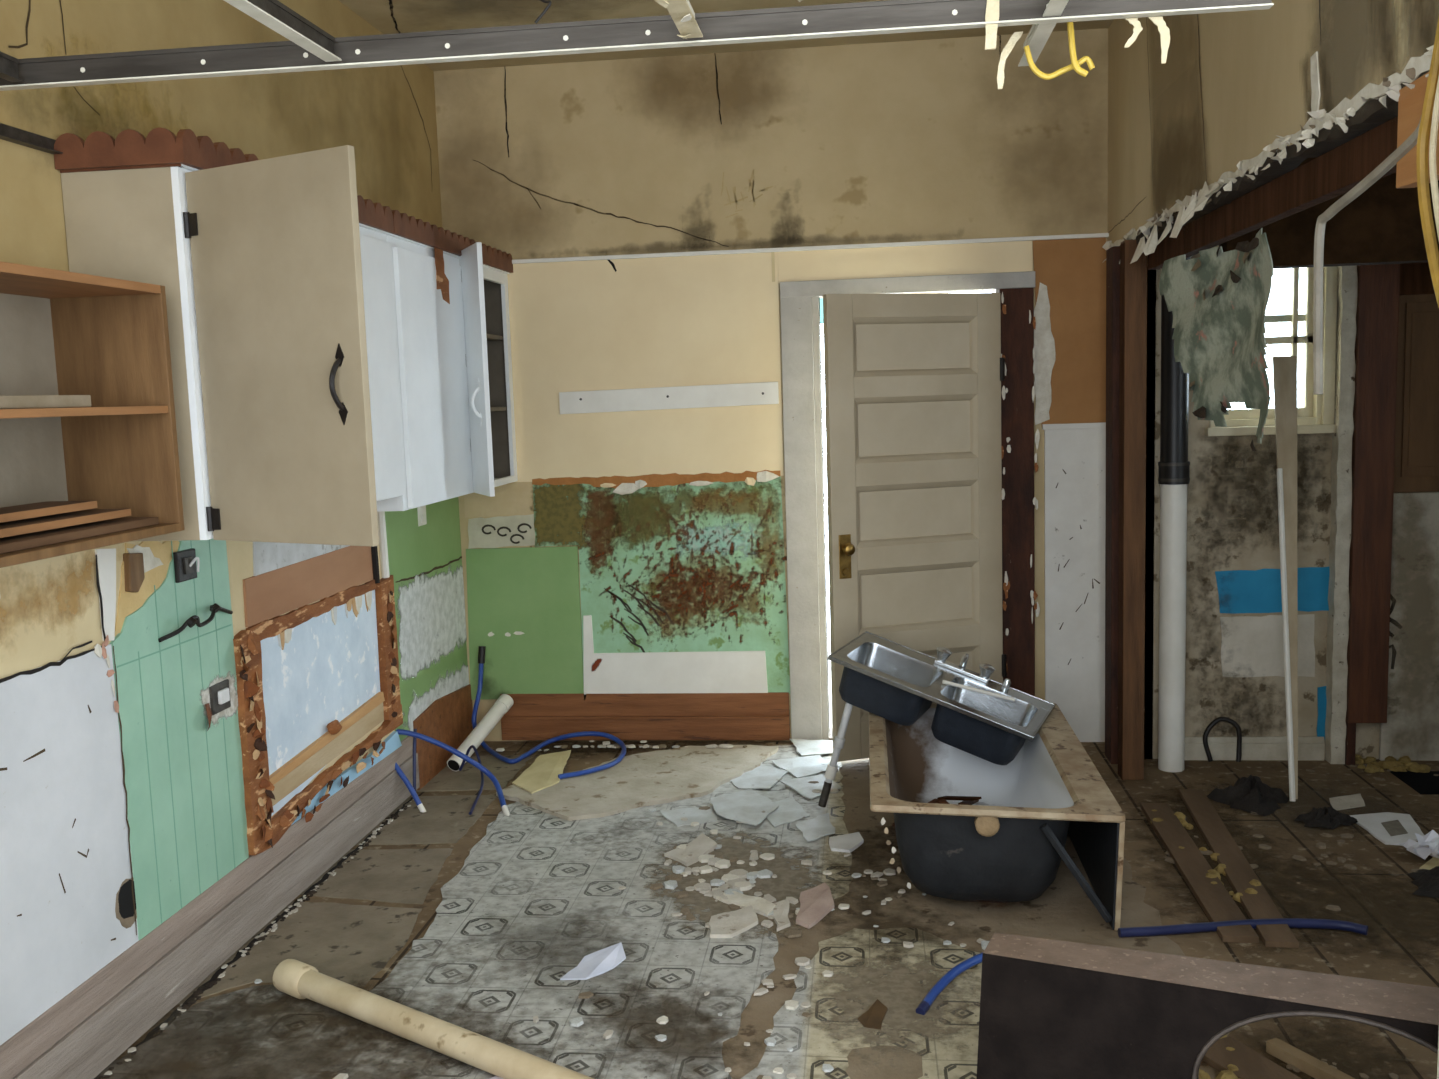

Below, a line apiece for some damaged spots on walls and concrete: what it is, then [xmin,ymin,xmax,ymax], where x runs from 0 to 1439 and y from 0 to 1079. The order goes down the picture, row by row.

crack [473,70,729,247]
flaking render [1102,45,1434,264]
water stain [1200,437,1279,559]
water stain [1297,434,1326,538]
water stain [0,560,93,622]
peeling [331,566,469,731]
water stain [1388,502,1439,712]
peeling [200,628,385,848]